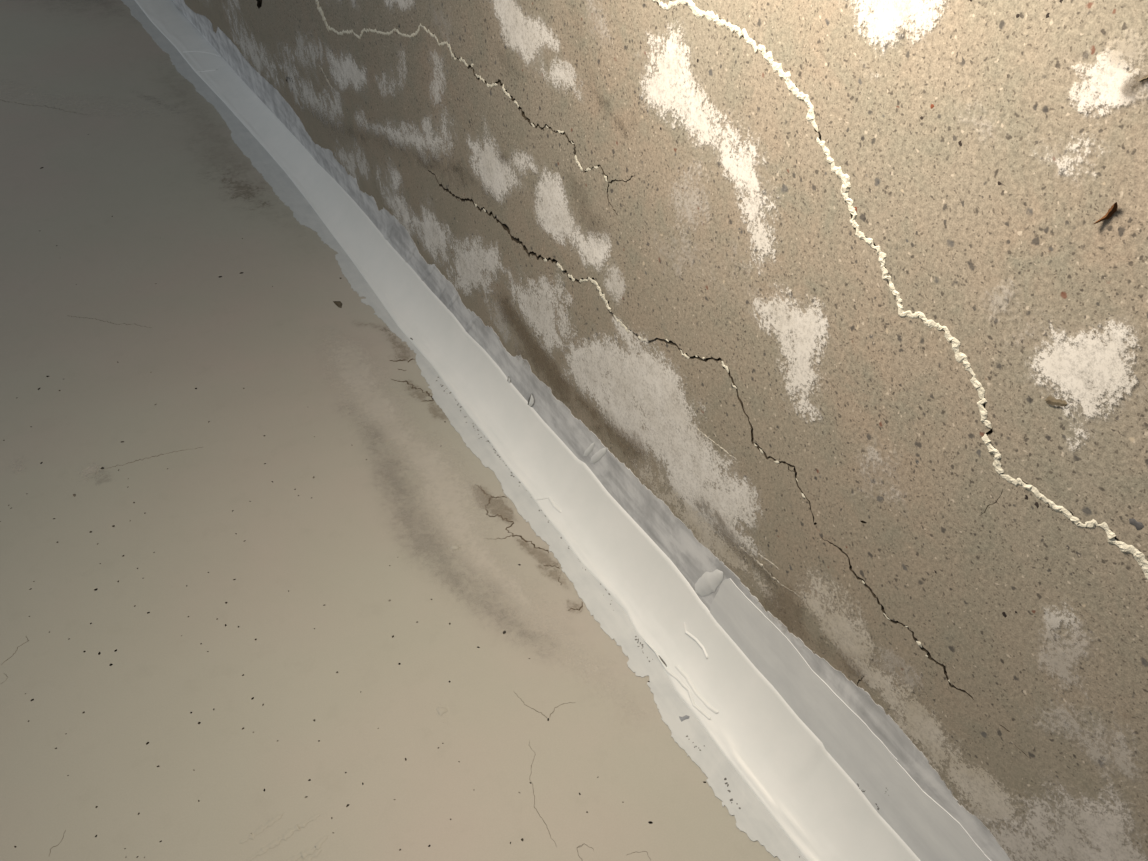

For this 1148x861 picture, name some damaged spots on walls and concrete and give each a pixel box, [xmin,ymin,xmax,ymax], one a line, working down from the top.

water stain [223,0,626,301]
crack [315,0,633,214]
water stain [640,23,777,274]
water stain [851,0,947,52]
water stain [1069,47,1147,117]
water stain [332,138,780,608]
crack [428,170,974,700]
water stain [753,285,829,423]
crack [653,0,1148,580]
water stain [1029,319,1140,451]